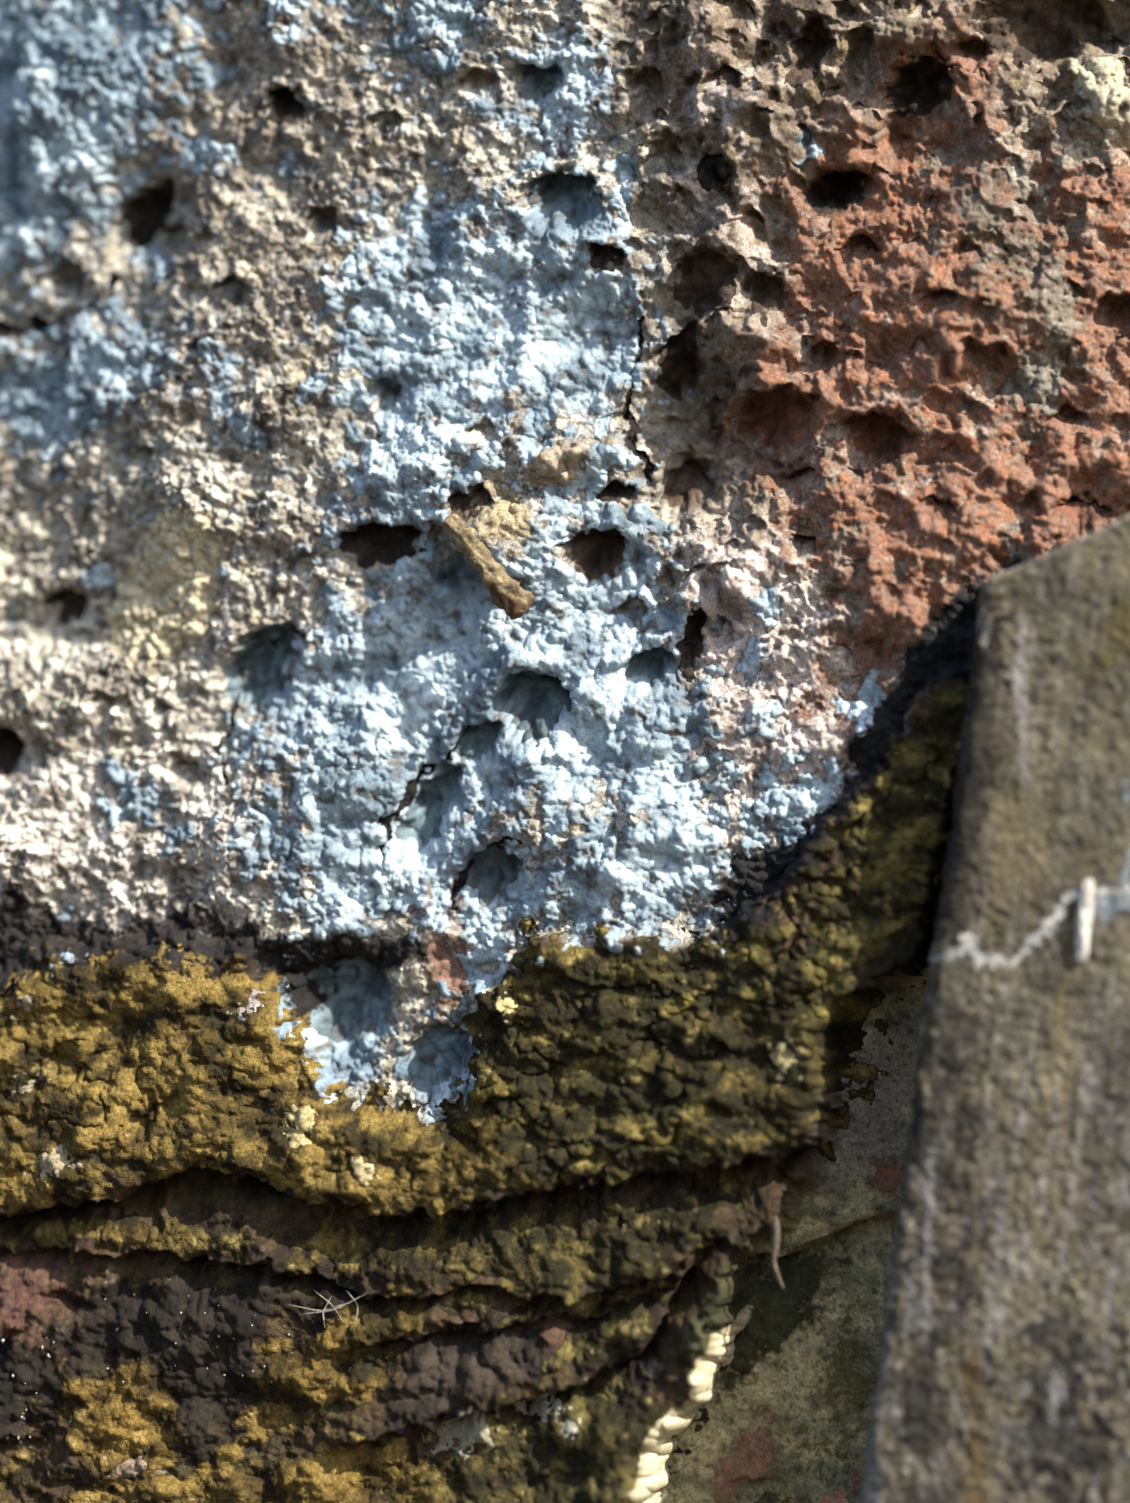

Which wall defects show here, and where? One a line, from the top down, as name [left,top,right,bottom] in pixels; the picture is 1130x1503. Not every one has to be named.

crack [622,316,655,483]
rust [699,5,1130,770]
spalling [0,0,1130,1120]
crack [378,725,471,862]
damp [23,1144,83,1186]
damp [0,878,429,1025]
damp [279,1104,319,1154]
damp [485,977,523,1023]
damp [767,1028,805,1087]
damp [0,1334,62,1445]
damp [70,1256,296,1479]
damp [368,1311,581,1460]